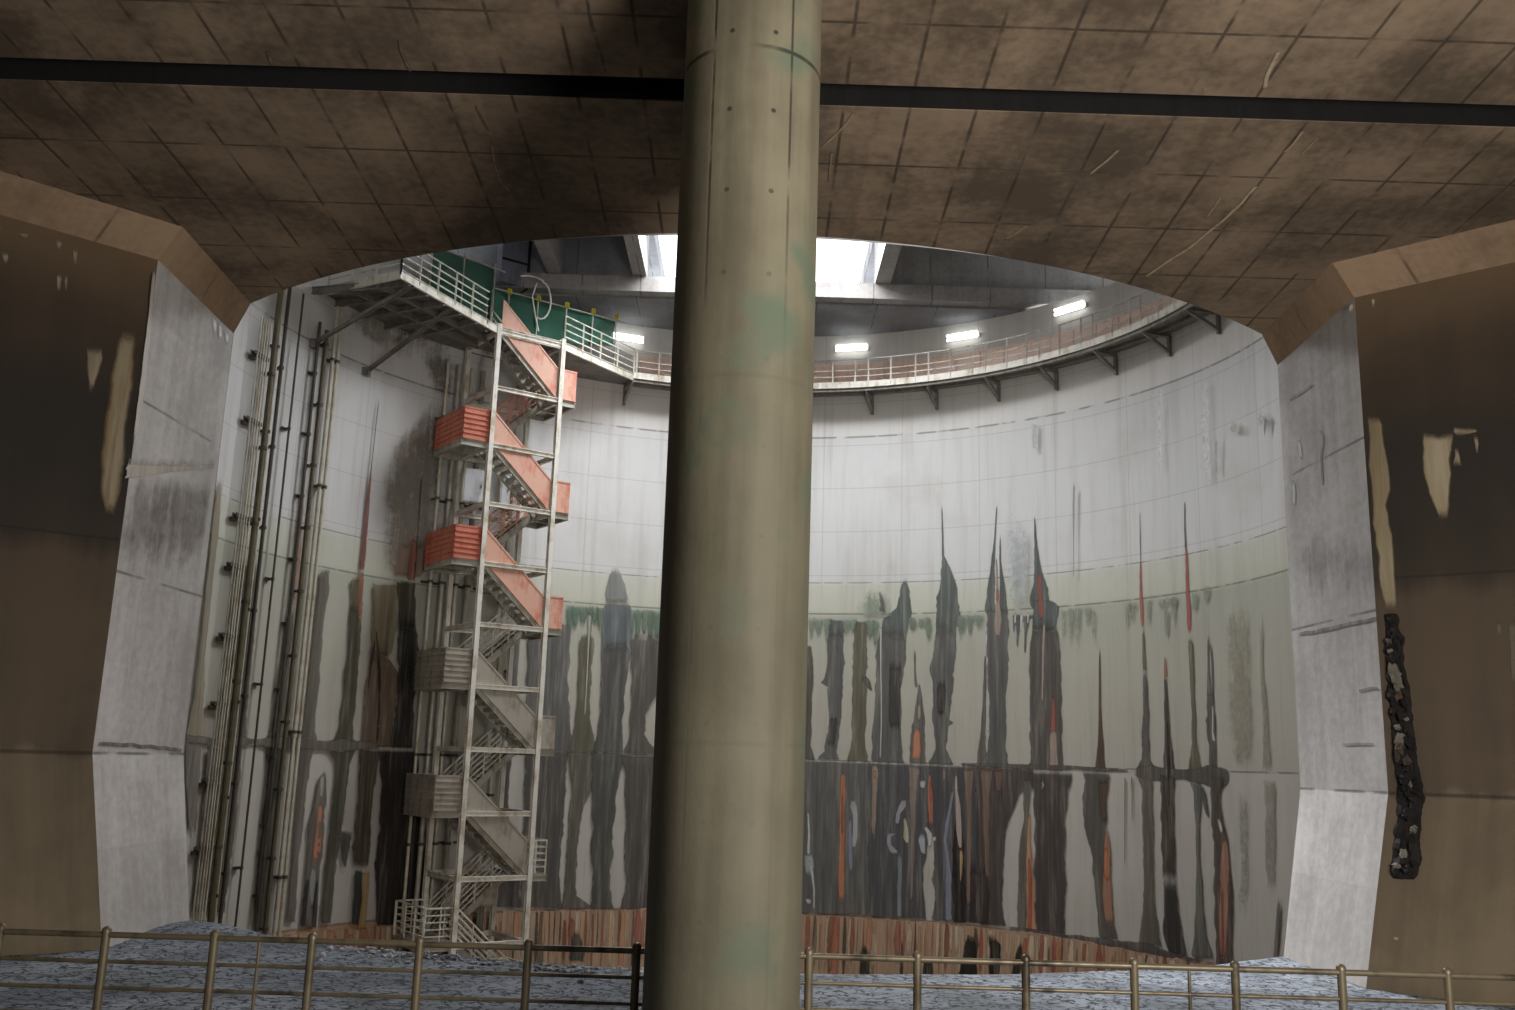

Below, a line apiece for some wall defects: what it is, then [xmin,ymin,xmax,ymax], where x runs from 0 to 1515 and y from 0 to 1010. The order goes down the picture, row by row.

damp [131,415,439,927]
damp [497,570,659,910]
damp [802,508,1276,964]
spalling [1368,419,1426,880]
peeling [1423,429,1478,515]